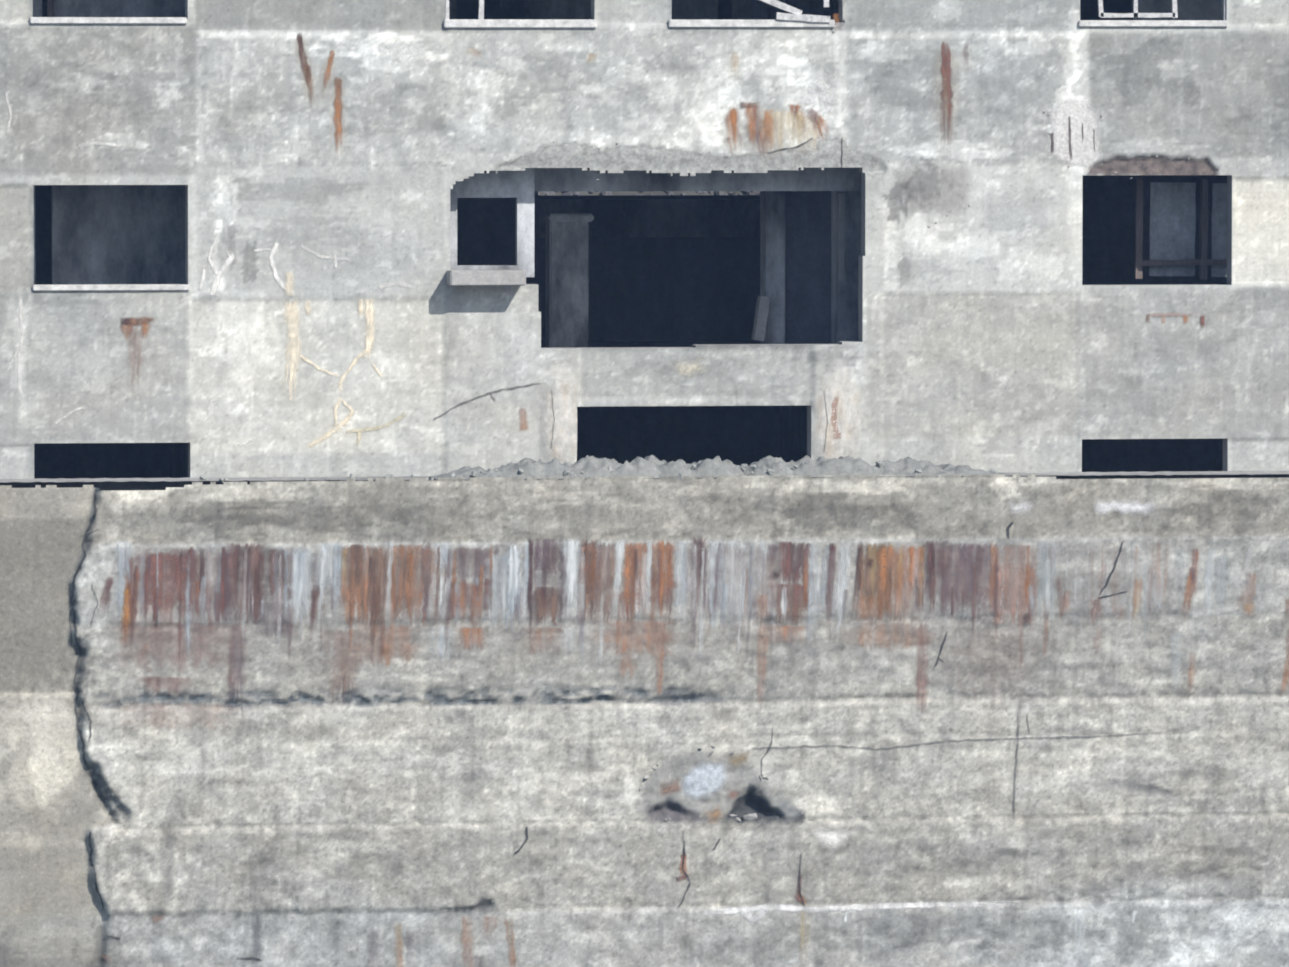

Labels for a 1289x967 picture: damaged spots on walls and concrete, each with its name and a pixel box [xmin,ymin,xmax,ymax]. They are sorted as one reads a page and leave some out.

rust [297,34,342,143]
spalling [496,135,890,180]
rust [727,102,823,144]
rust [941,42,952,127]
peeling [1044,100,1219,179]
rust [121,318,153,335]
crack [69,493,98,770]
rust [510,539,674,681]
rust [776,542,993,633]
spalling [649,745,806,823]
peeling [818,832,847,845]
crack [89,832,120,939]